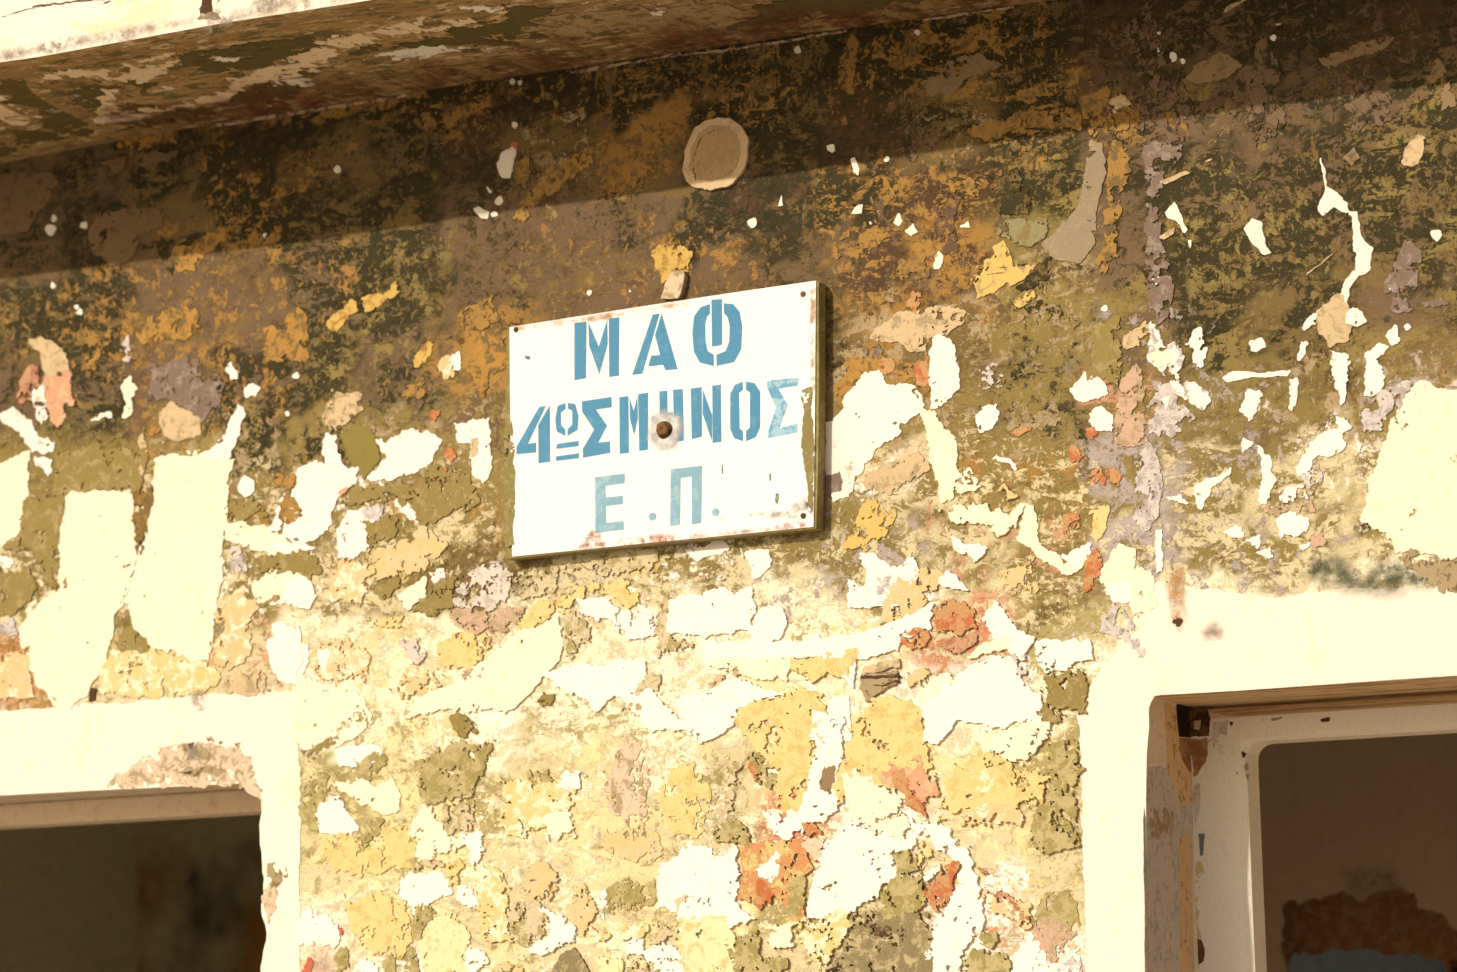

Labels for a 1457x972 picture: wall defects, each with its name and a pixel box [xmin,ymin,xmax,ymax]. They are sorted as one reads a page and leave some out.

peeling [0,0,924,236]
peeling [81,301,201,370]
peeling [262,307,310,379]
peeling [326,281,400,331]
peeling [401,295,506,401]
peeling [651,245,693,285]
peeling [825,1,1286,659]
peeling [1214,230,1457,564]
corrosion [1170,569,1183,627]
peeling [0,336,1094,972]
peeling [1143,702,1233,972]
spalling [1281,886,1457,972]